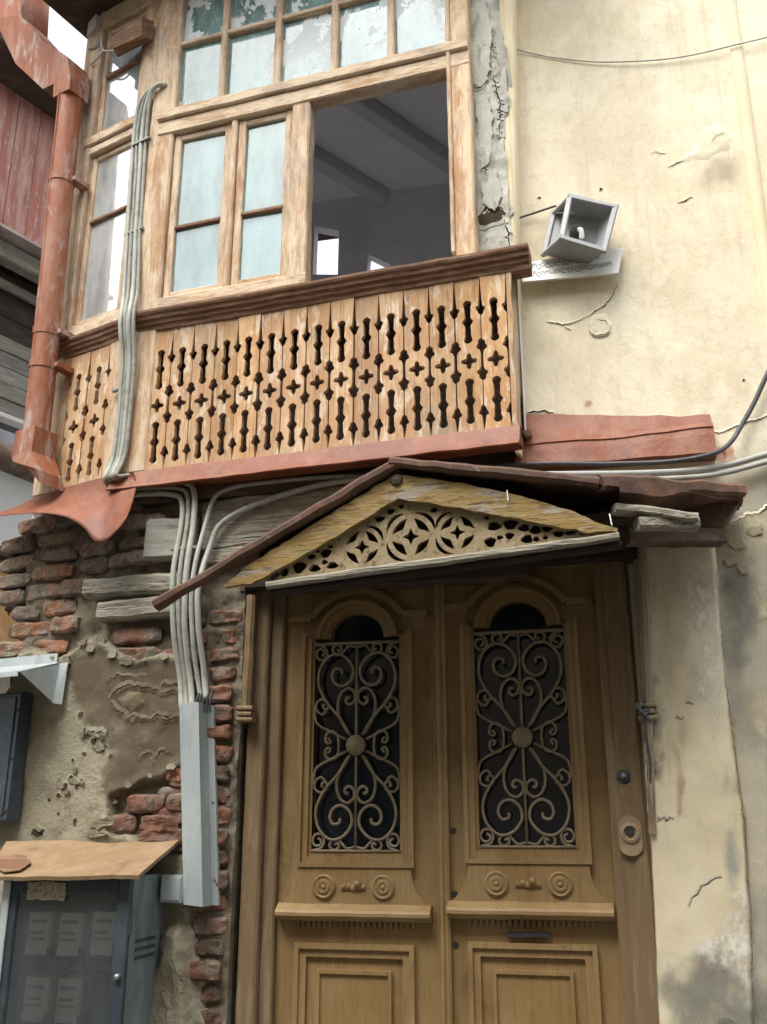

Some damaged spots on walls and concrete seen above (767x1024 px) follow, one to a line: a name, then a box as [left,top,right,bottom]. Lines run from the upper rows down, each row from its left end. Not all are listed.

peeling [470,0,516,252]
crack [546,282,620,331]
spalling [0,506,173,666]
spalling [722,515,767,575]
spalling [29,824,46,840]
spalling [47,727,109,816]
spalling [86,763,182,853]
spalling [177,610,245,1024]
crack [688,570,754,991]
leakage [666,890,767,1024]